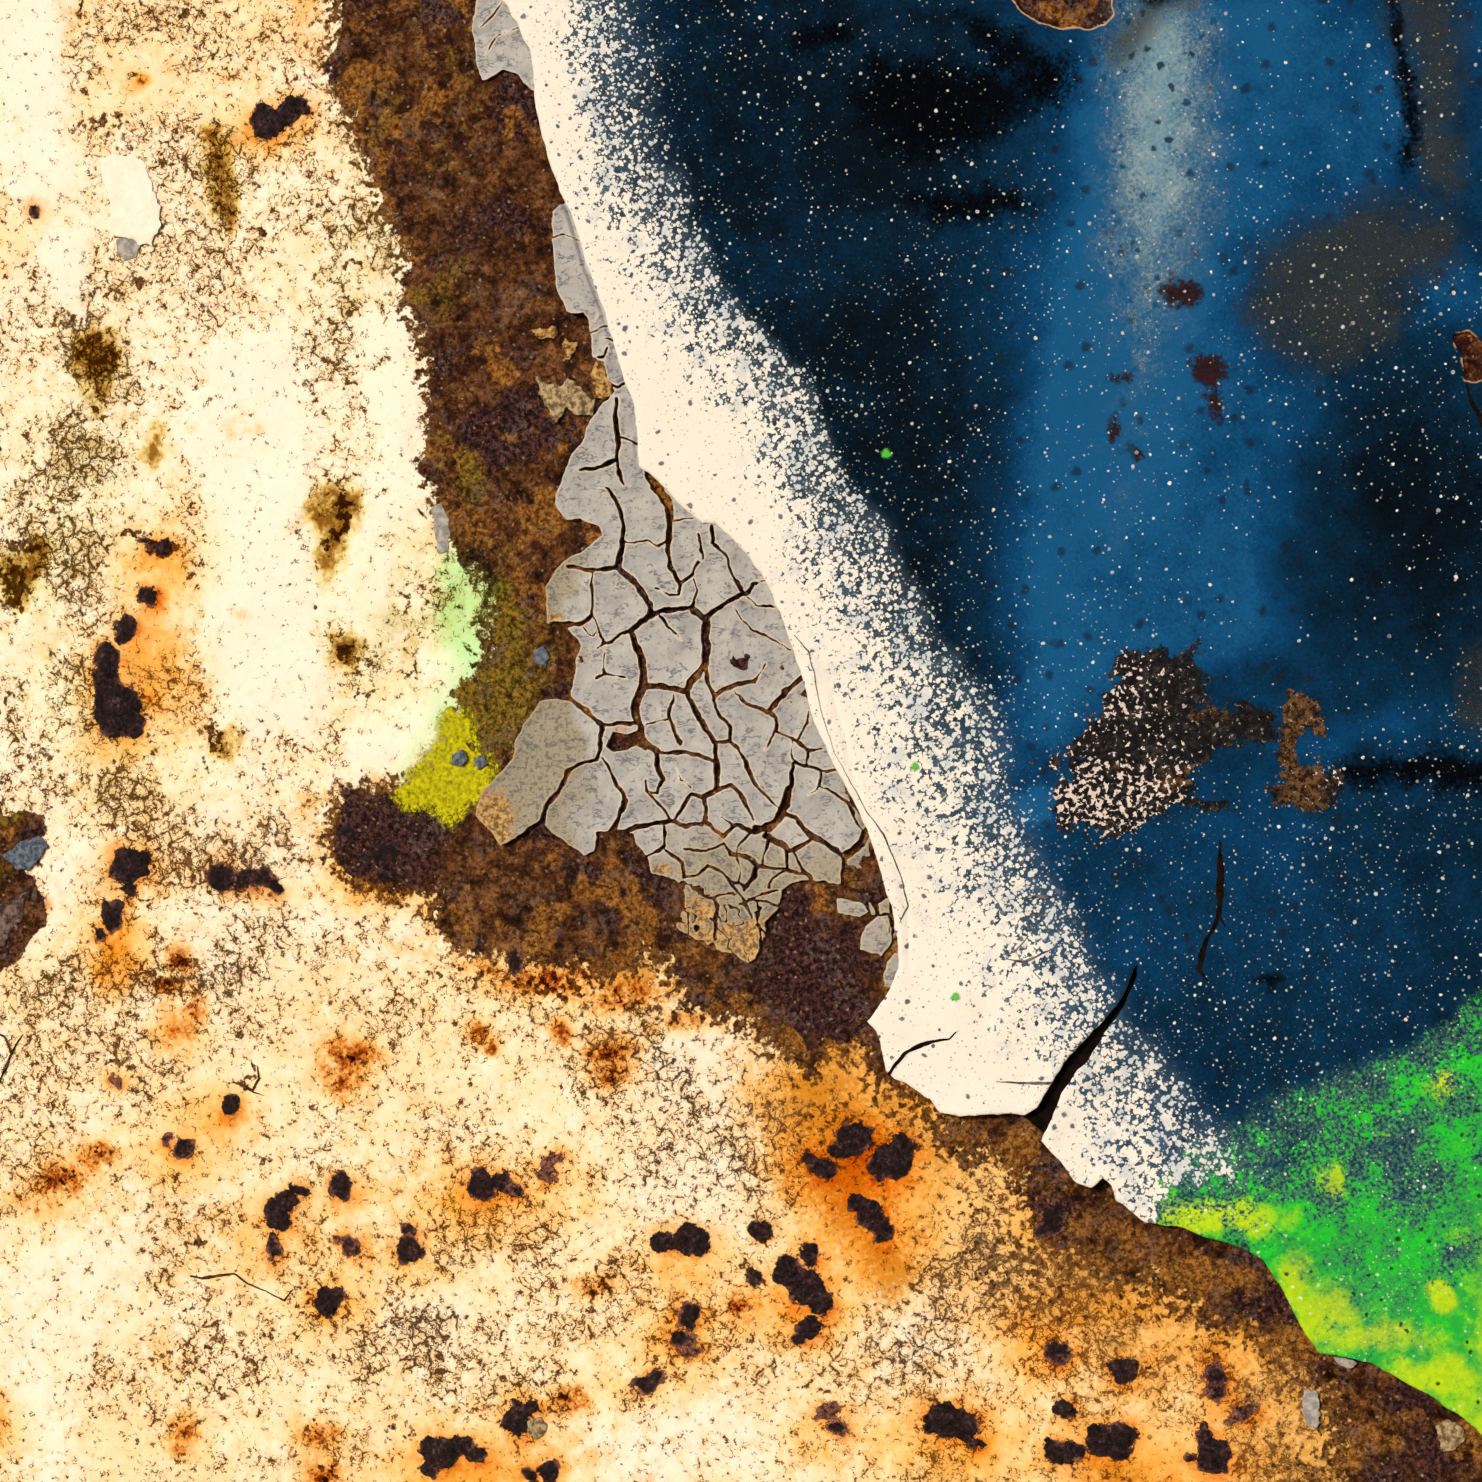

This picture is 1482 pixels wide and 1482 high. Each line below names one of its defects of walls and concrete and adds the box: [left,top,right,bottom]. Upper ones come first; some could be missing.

peeling [472,0,534,91]
peeling [3,836,47,871]
rust [0,807,50,972]
rust [92,847,152,944]
rust [92,585,160,739]
peeling [451,203,899,987]
crack [794,635,909,923]
rust [319,0,1482,1482]
spalling [1028,629,1346,849]
crack [1196,840,1225,980]
crack [996,965,1137,1133]
rust [263,1170,353,1262]